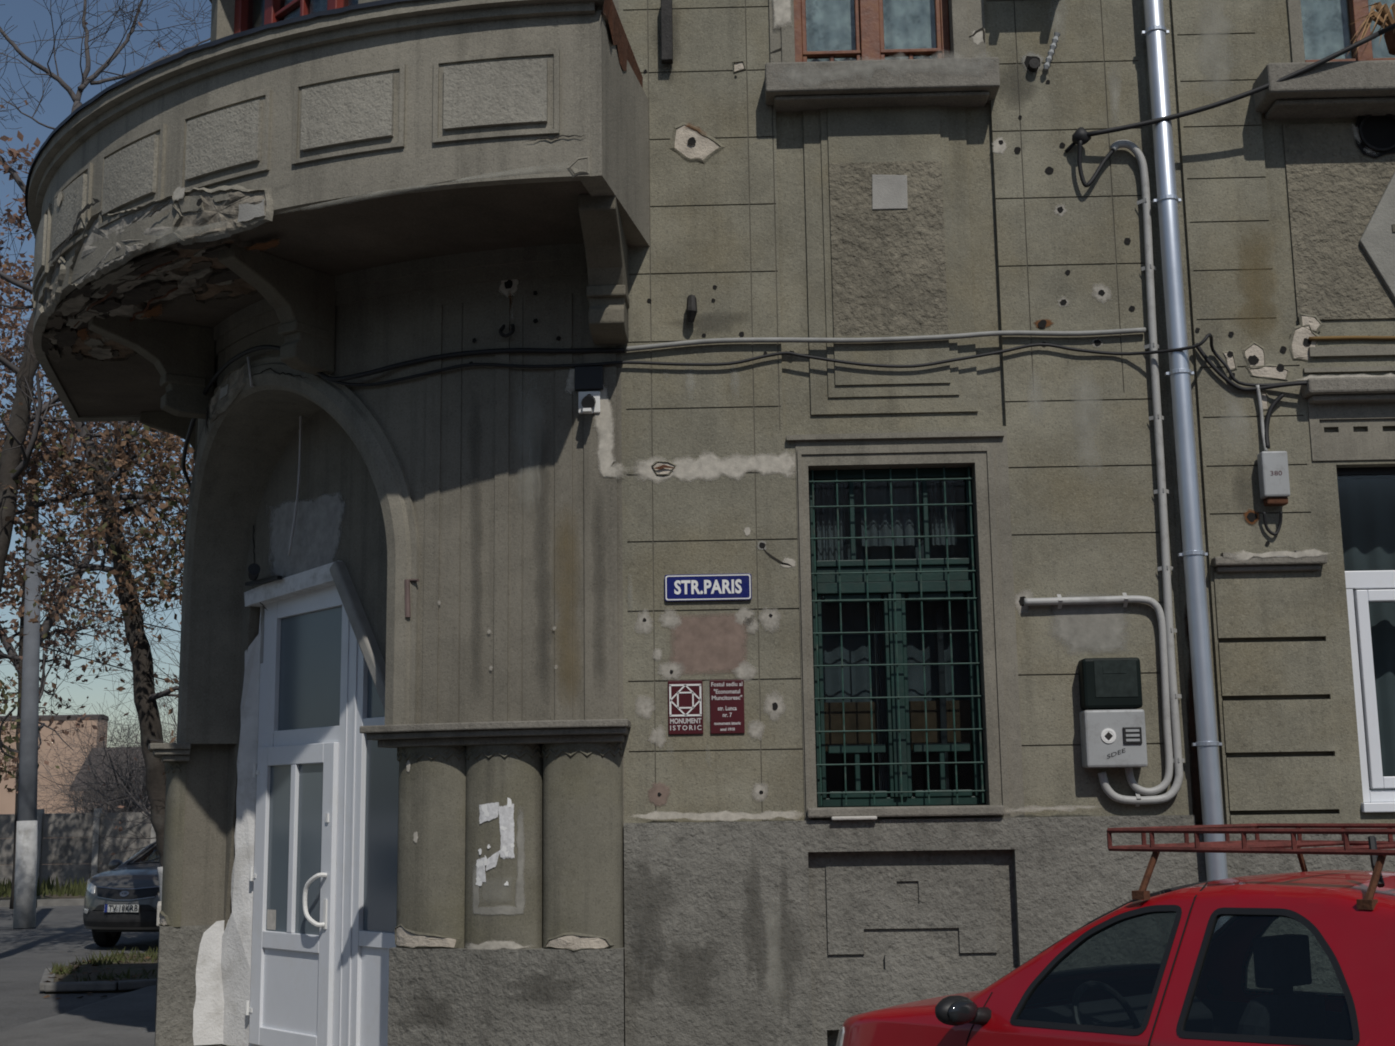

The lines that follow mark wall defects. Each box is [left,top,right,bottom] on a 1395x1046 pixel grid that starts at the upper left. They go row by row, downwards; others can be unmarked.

flaking render [669,122,725,164]
flaking render [38,185,274,364]
flaking render [1223,313,1395,411]
flaking render [651,461,677,476]